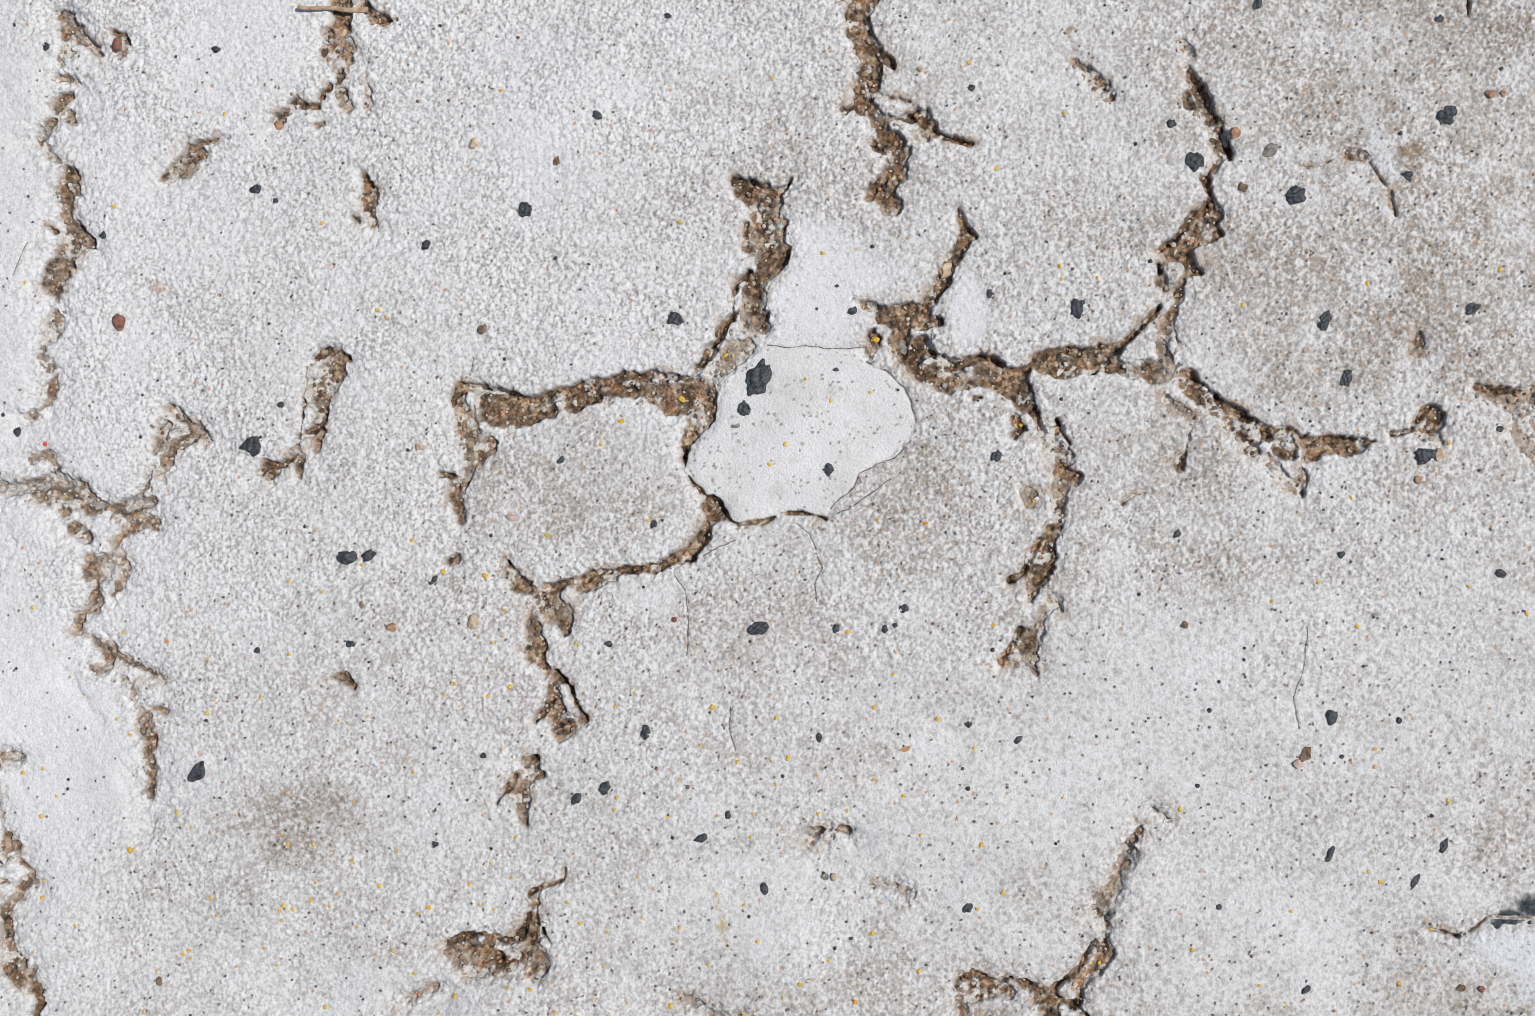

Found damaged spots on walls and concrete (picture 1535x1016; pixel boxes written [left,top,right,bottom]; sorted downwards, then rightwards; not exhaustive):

crack [274,0,393,129]
crack [832,0,974,216]
crack [1299,146,1397,217]
crack [0,9,213,802]
crack [258,344,353,486]
peeling [687,349,913,521]
crack [438,37,1375,825]
crack [0,802,47,1016]
crack [405,982,442,1005]
crack [672,995,741,1016]
crack [952,807,1173,1016]
crack [1432,915,1535,937]